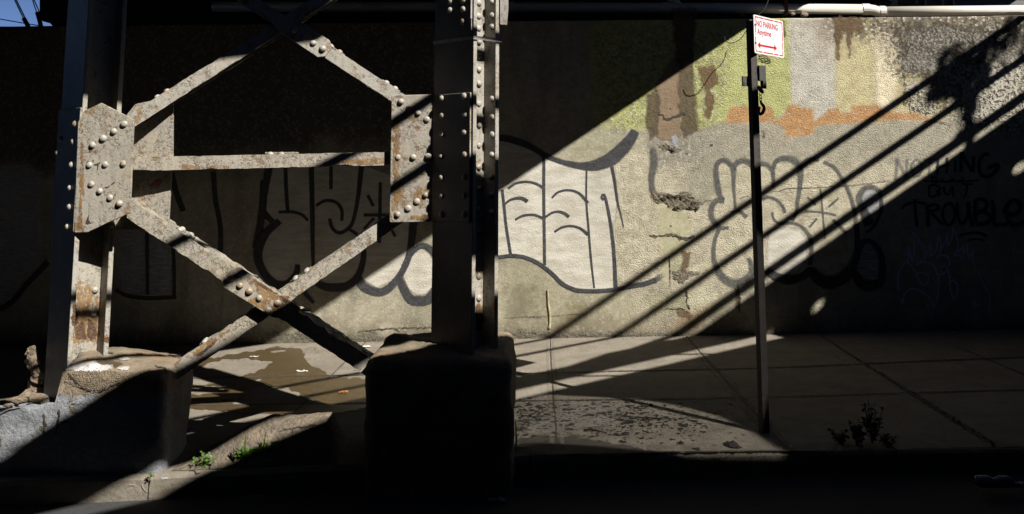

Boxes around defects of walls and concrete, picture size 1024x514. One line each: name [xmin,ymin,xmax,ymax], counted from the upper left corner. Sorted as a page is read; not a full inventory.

rust [77,122,85,229]
spalling [650,190,702,210]
rust [71,285,109,344]
rust [248,278,311,316]